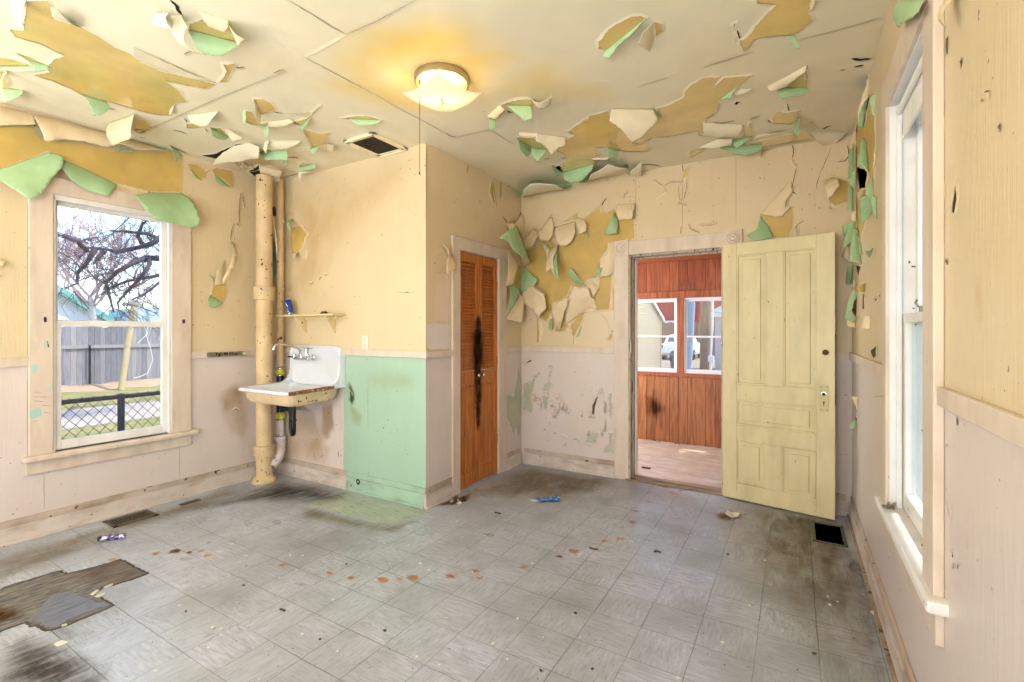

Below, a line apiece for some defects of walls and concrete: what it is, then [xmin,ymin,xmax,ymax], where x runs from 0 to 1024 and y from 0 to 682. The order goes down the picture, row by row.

peeling [595,13,666,58]
peeling [729,0,817,52]
peeling [0,0,335,308]
peeling [339,114,384,126]
peeling [482,65,882,345]
crack [653,164,718,234]
crack [785,145,849,206]
peeling [507,358,614,454]
peeling [0,559,149,647]